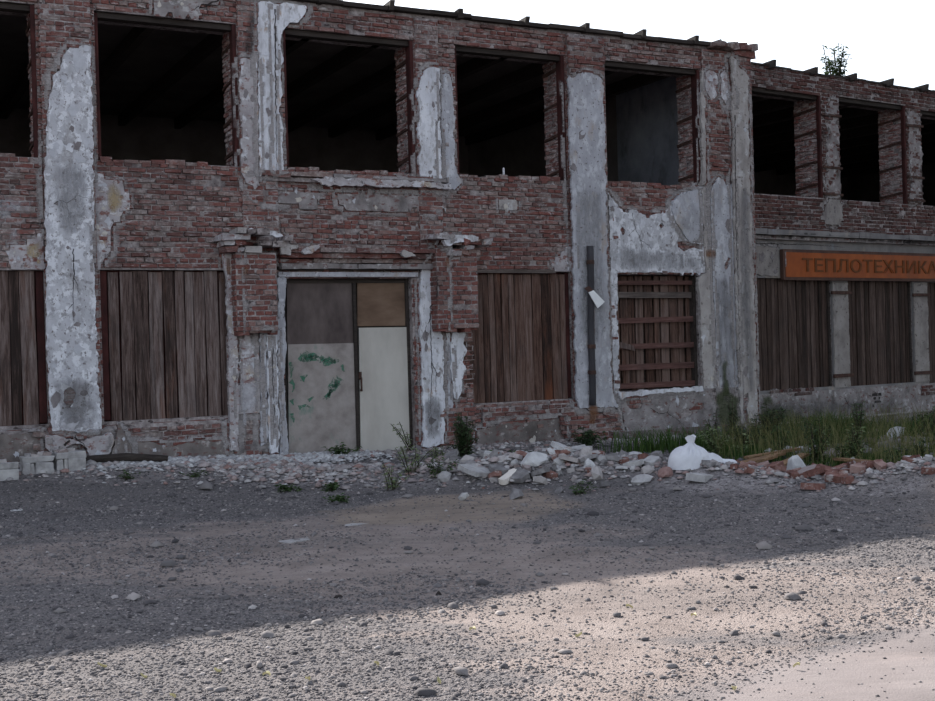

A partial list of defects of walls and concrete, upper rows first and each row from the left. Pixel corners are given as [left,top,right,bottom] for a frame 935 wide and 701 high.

flaking render [0,23,393,483]
flaking render [232,0,818,448]